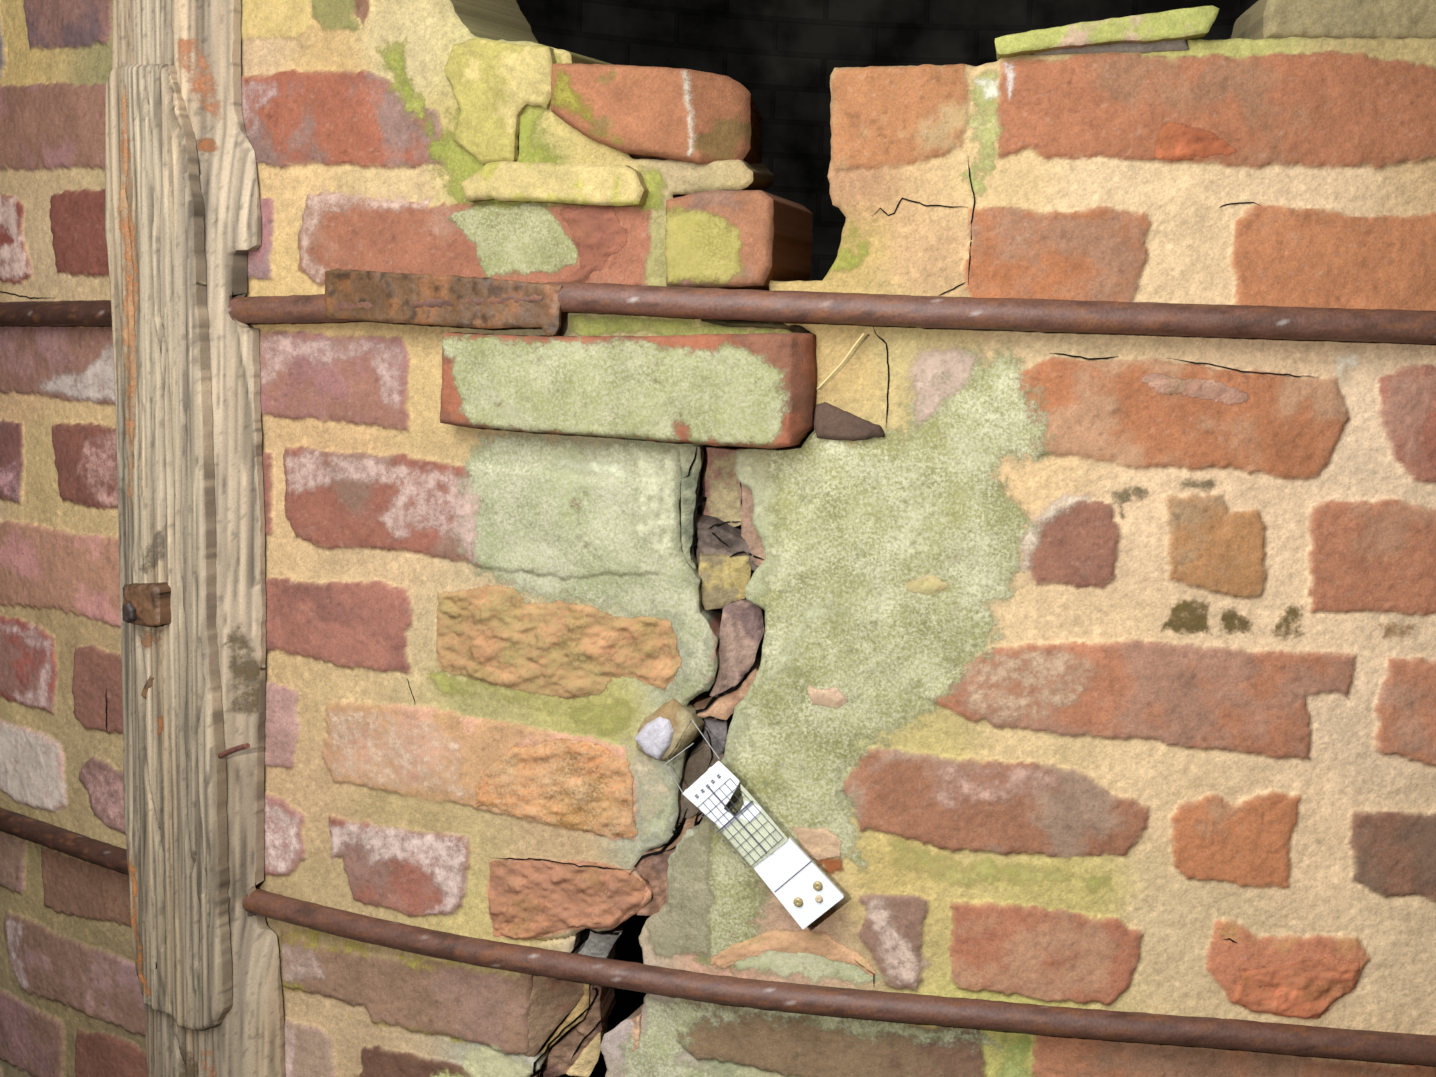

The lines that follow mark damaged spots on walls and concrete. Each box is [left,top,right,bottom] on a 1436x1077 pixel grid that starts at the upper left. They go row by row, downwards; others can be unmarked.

spalling [1154,122,1237,160]
spalling [560,205,627,283]
spalling [666,190,813,291]
crack [871,163,975,296]
water stain [909,348,975,425]
water stain [556,447,680,556]
water stain [966,650,1091,723]
crack [499,445,765,1077]
water stain [931,765,1062,807]